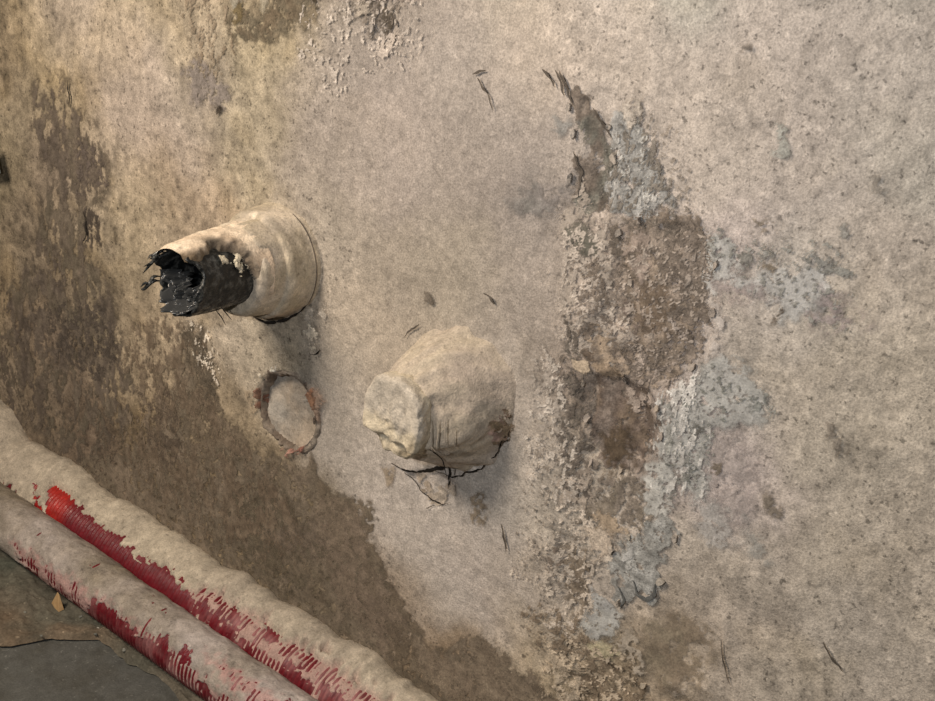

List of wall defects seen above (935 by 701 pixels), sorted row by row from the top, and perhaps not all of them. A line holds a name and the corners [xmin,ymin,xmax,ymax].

water stain [225,0,318,44]
rust [245,388,270,413]
water stain [0,81,558,701]
water stain [509,205,644,672]
water stain [638,218,857,525]